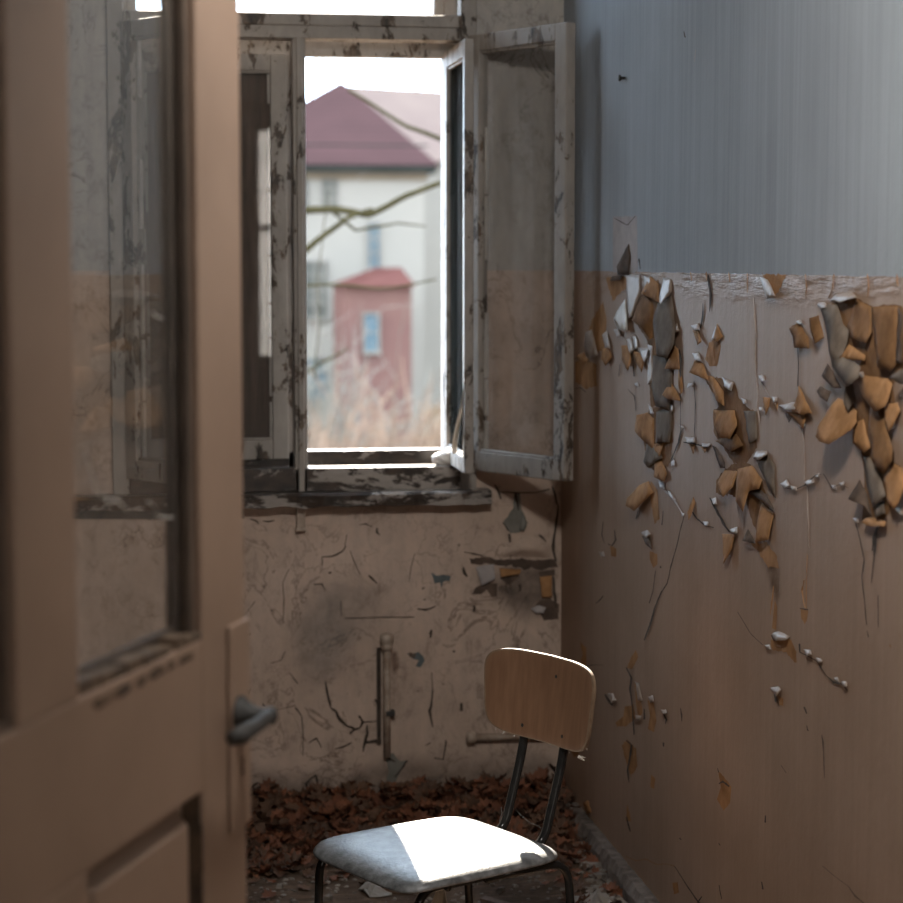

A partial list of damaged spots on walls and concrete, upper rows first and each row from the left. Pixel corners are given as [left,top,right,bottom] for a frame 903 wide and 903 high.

peeling [760,273,786,299]
peeling [575,215,779,569]
peeling [789,292,903,551]
crack [314,523,380,590]
crack [409,554,436,611]
flaking render [458,544,559,621]
peeling [503,493,528,543]
crack [478,485,559,562]
crack [262,652,377,752]
crack [426,672,447,760]